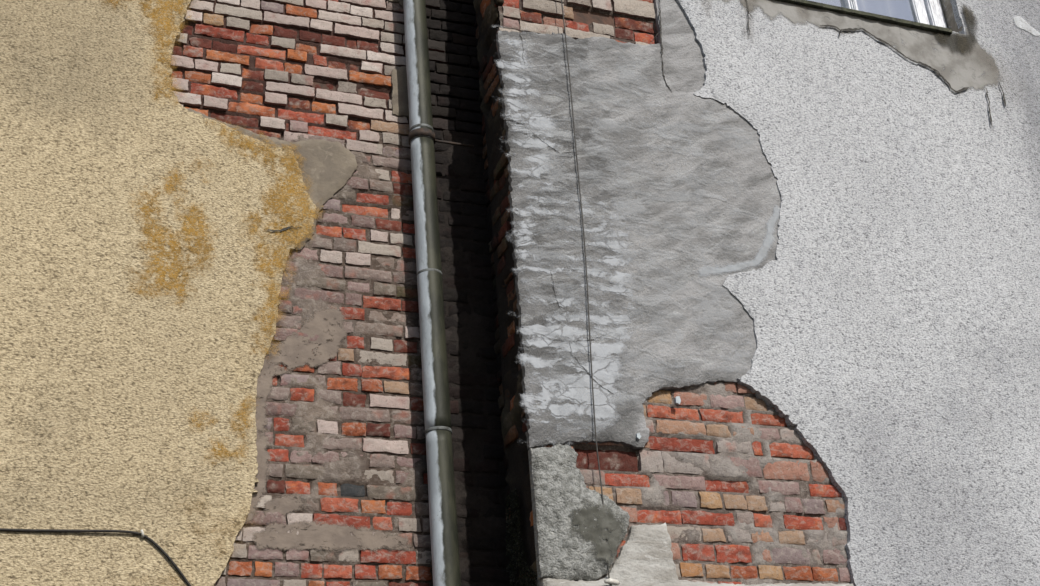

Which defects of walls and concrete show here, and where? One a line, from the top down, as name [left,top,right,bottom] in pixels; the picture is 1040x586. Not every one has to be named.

water stain [136,169,213,302]
spalling [169,0,433,586]
spalling [425,0,512,586]
peeling [495,0,706,428]
spalling [538,381,851,585]
peeling [1013,16,1040,36]